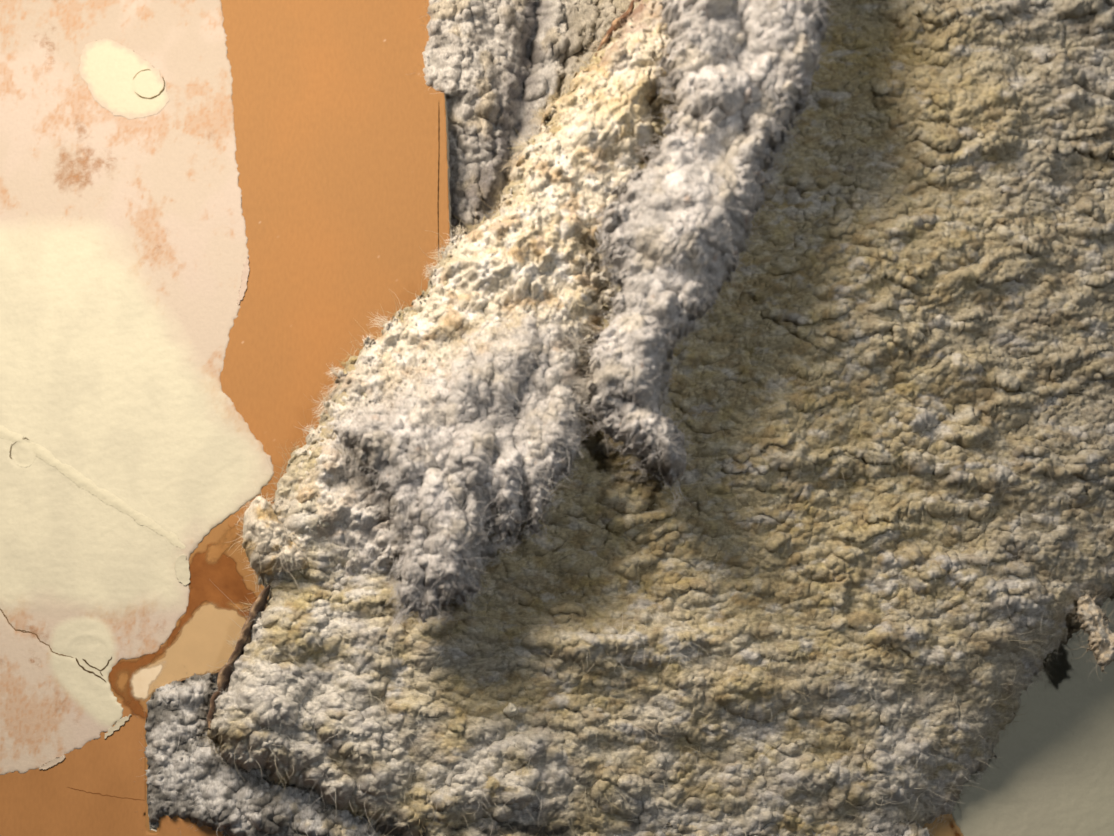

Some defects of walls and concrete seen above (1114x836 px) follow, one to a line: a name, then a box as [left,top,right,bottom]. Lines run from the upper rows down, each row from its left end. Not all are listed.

peeling [220,0,450,533]
peeling [0,604,246,836]
peeling [175,555,190,586]
water stain [109,520,257,718]